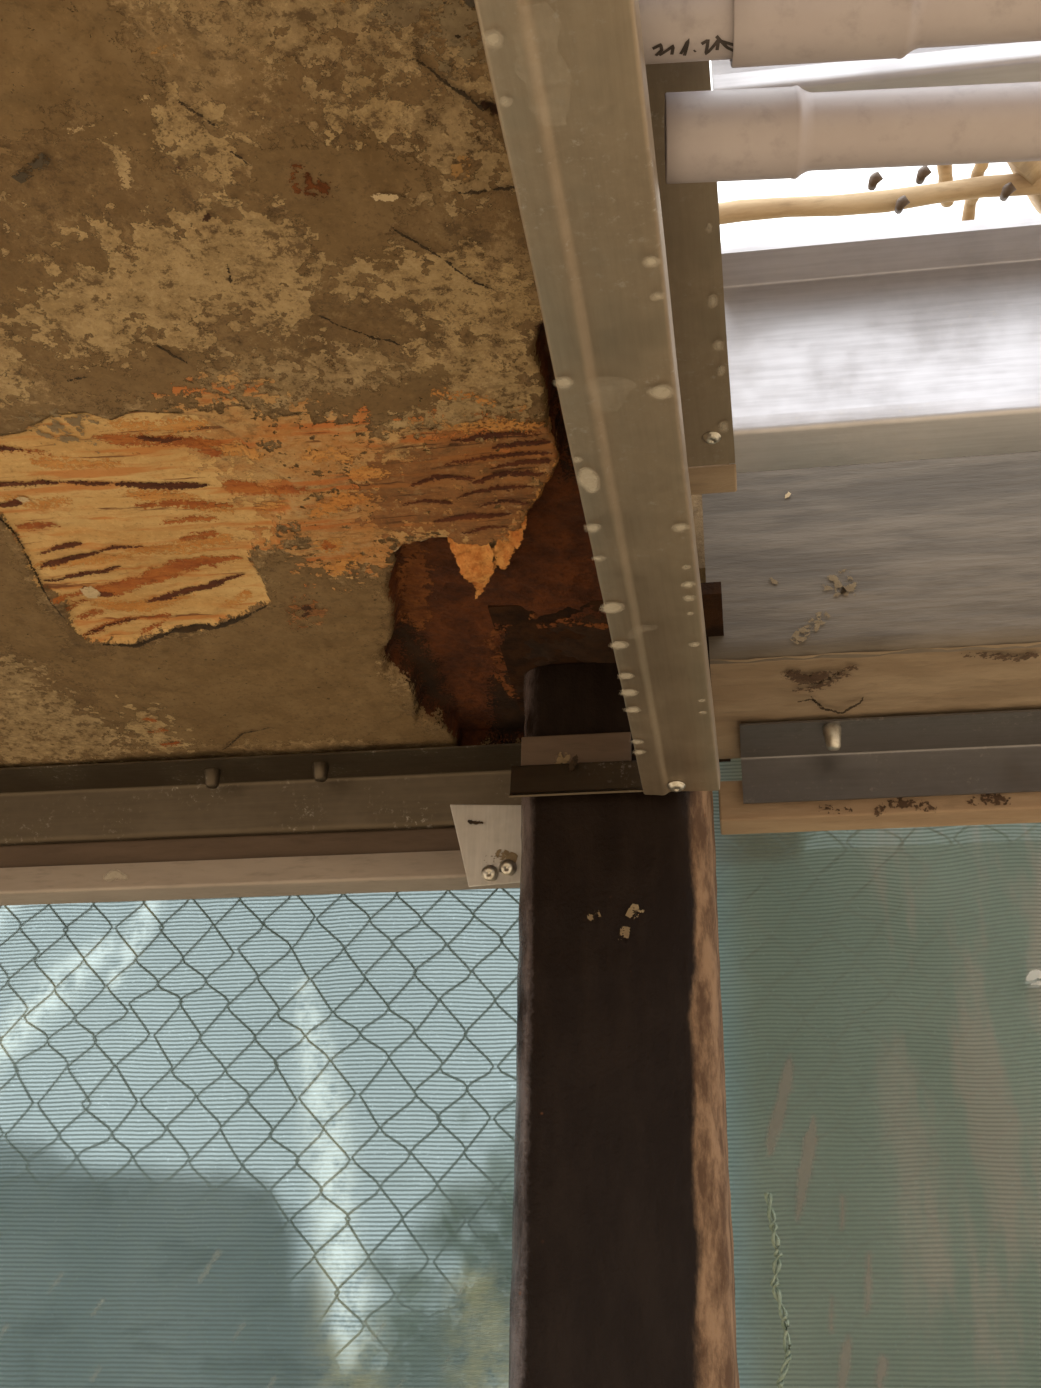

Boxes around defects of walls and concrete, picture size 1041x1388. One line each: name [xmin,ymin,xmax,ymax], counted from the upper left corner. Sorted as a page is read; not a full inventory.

peeling [133,0,520,227]
peeling [0,75,616,746]
rust [145,369,559,630]
peeling [0,648,196,768]